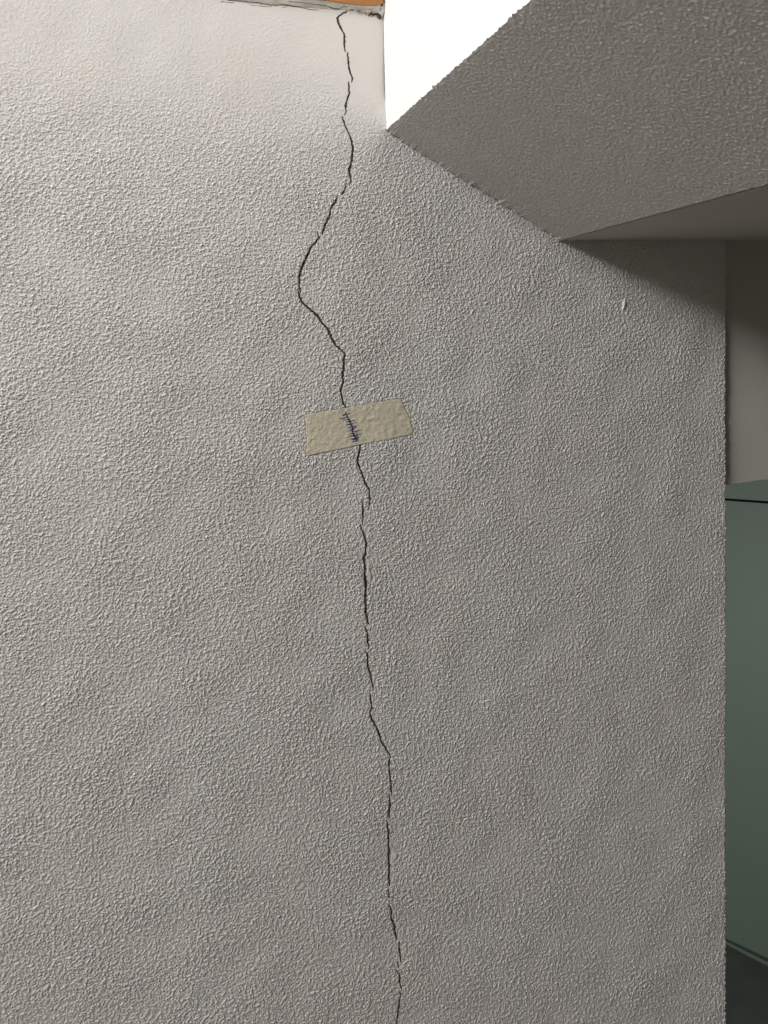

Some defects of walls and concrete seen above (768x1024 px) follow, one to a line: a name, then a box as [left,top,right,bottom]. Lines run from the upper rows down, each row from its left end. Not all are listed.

crack [220,0,355,408]
crack [356,445,402,1024]